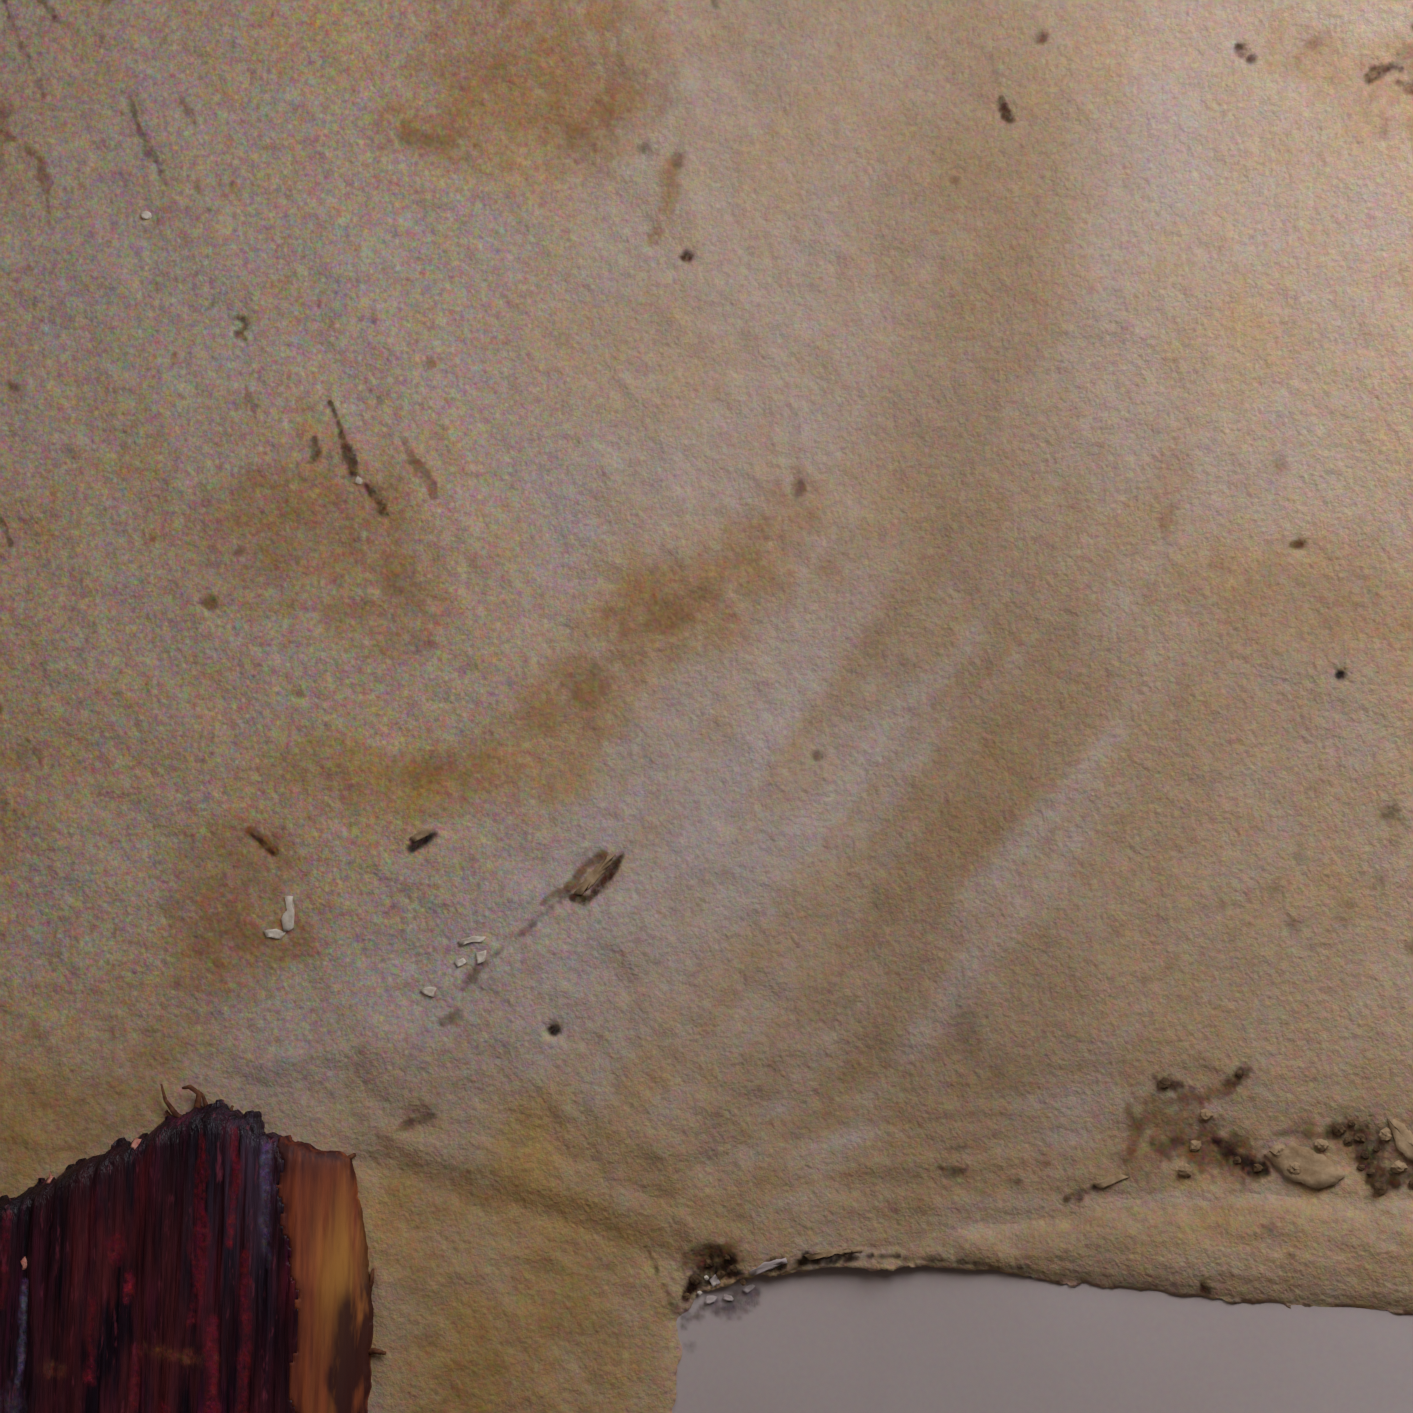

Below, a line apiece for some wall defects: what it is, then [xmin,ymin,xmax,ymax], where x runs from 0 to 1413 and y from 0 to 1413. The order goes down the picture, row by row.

spalling [564,850,623,905]